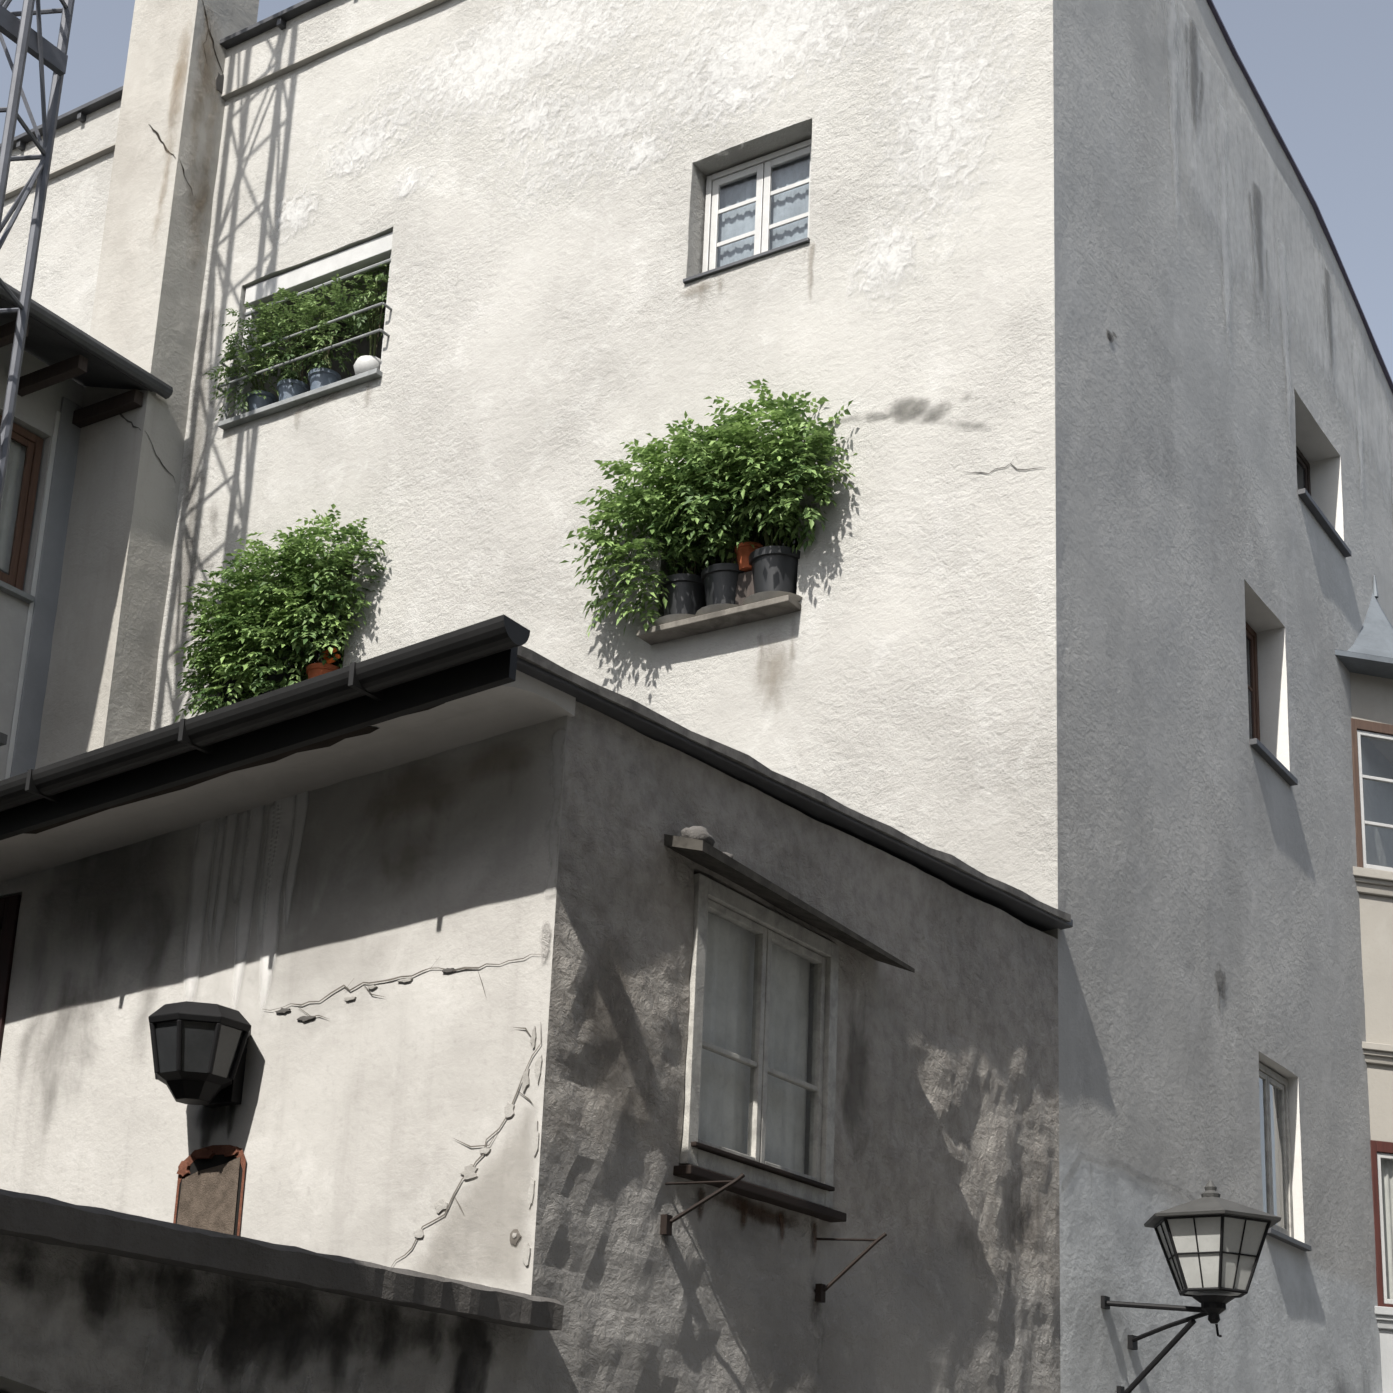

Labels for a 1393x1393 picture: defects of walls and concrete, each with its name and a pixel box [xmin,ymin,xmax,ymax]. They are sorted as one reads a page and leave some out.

crack [150,125,193,195]
crack [120,414,175,481]
crack [965,457,1046,474]
crack [263,954,542,1022]
crack [391,1026,541,1267]
damp [156,1270,435,1393]
damp [455,1318,491,1393]